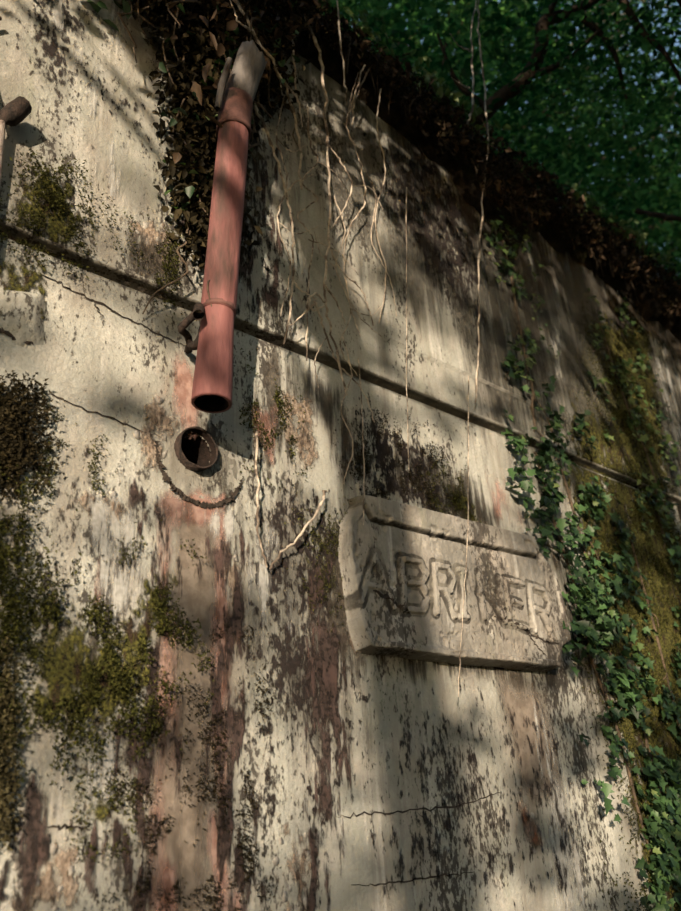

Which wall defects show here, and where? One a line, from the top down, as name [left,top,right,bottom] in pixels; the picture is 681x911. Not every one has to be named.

crack [42,275,185,346]
crack [39,388,244,509]
water stain [342,408,351,459]
water stain [298,554,352,911]
crack [336,792,500,841]
water stain [495,668,585,911]
crack [351,872,473,886]